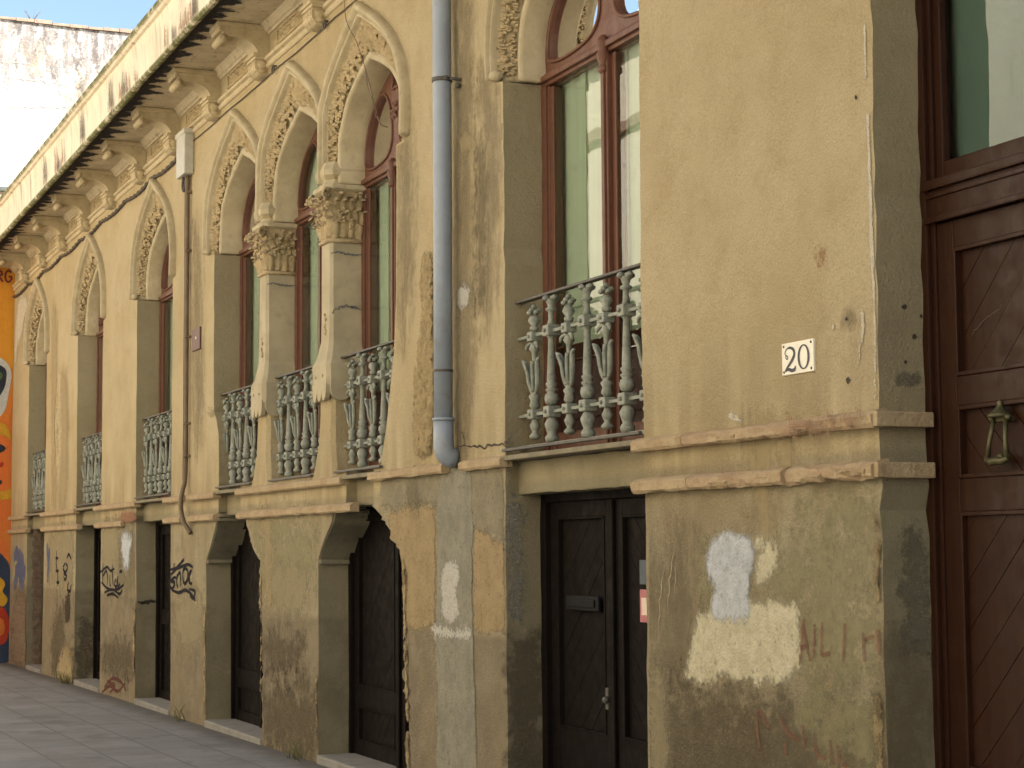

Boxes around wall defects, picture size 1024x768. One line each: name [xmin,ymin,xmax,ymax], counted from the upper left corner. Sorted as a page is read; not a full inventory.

water stain [51,603,135,682]
water stain [262,622,318,757]
flaking render [401,559,410,766]
water stain [896,527,932,654]